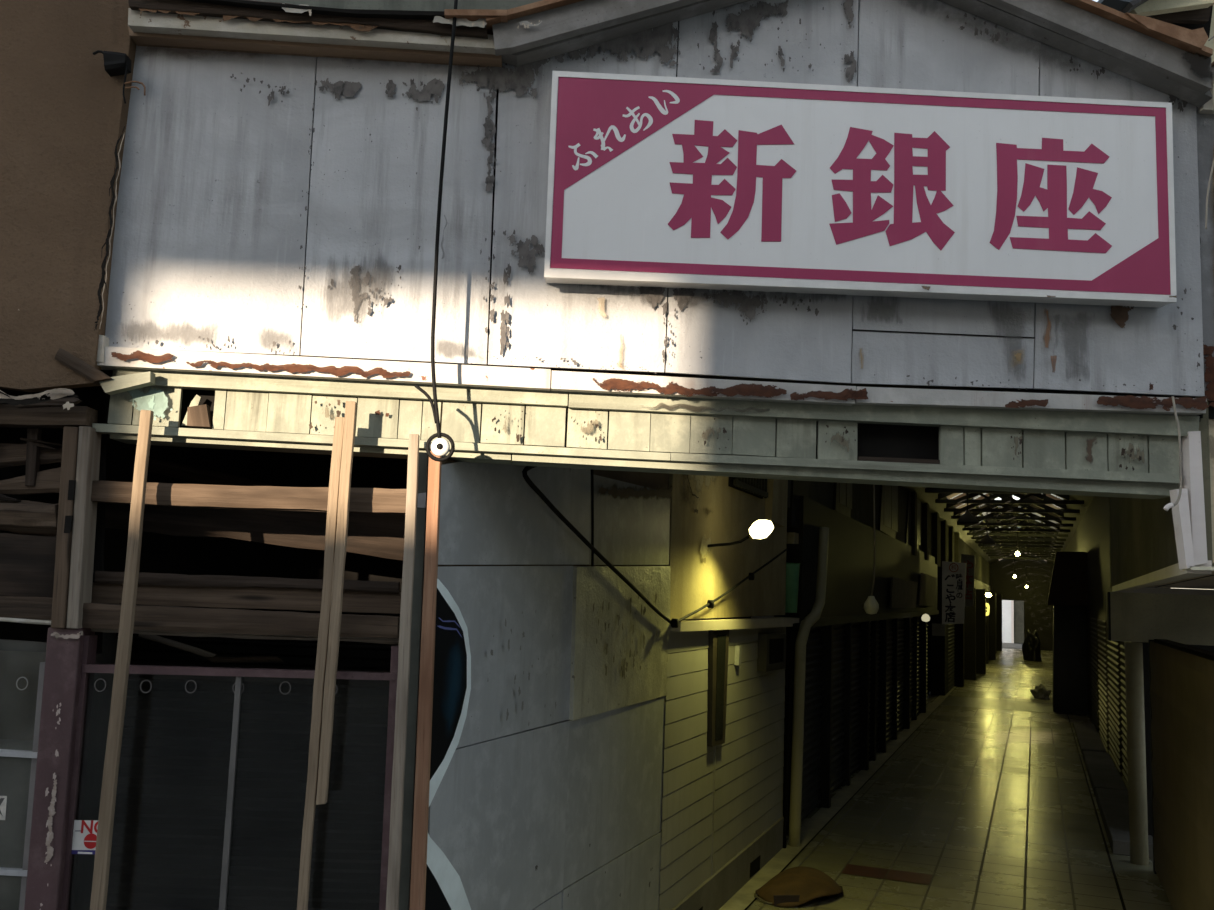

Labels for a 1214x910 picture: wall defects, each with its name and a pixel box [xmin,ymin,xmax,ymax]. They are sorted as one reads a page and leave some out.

peeling [433,16,487,28]
peeling [695,0,814,73]
peeling [841,0,854,28]
peeling [840,43,857,83]
rust [1110,305,1134,328]
rust [111,350,410,378]
rust [592,344,868,401]
rust [1097,341,1214,411]
rust [1005,399,1048,408]
peeling [44,773,57,866]